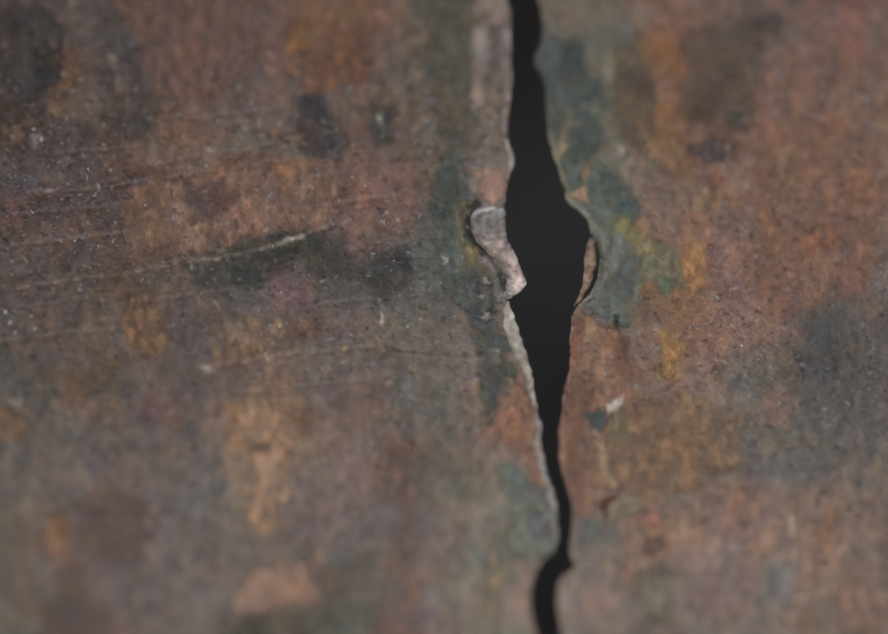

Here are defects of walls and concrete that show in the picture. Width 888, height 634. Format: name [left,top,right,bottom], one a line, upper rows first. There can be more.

rust [646,102,689,178]
rust [467,168,507,204]
rust [121,293,167,356]
crack [502,0,600,634]
rust [673,240,707,317]
rust [558,305,685,520]